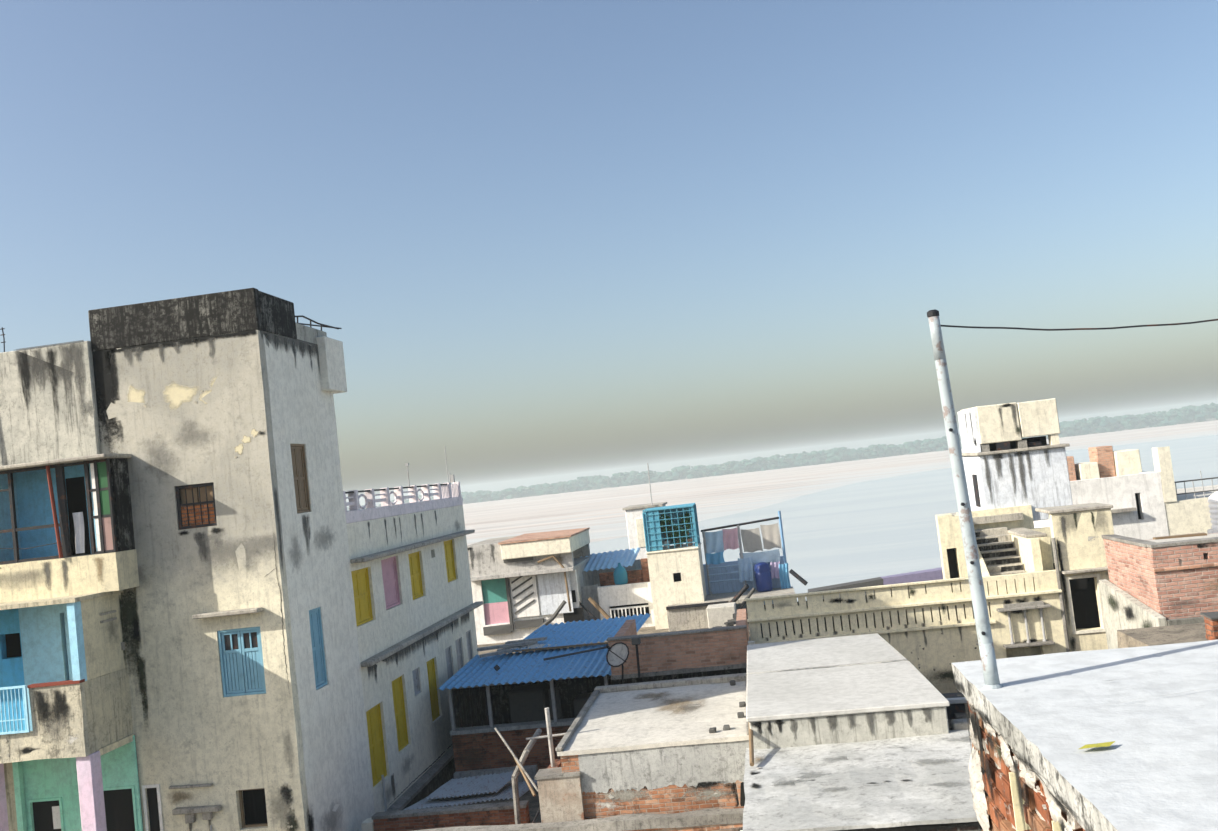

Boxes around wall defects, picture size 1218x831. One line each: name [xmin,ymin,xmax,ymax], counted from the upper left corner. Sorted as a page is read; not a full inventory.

flaking render [128,386,147,408]
leakage [16,330,319,442]
flaking render [164,378,217,408]
flaking render [234,429,265,458]
leakage [119,587,148,718]
leakage [34,691,69,726]
spalling [983,721,1073,831]
leakage [836,821,982,831]